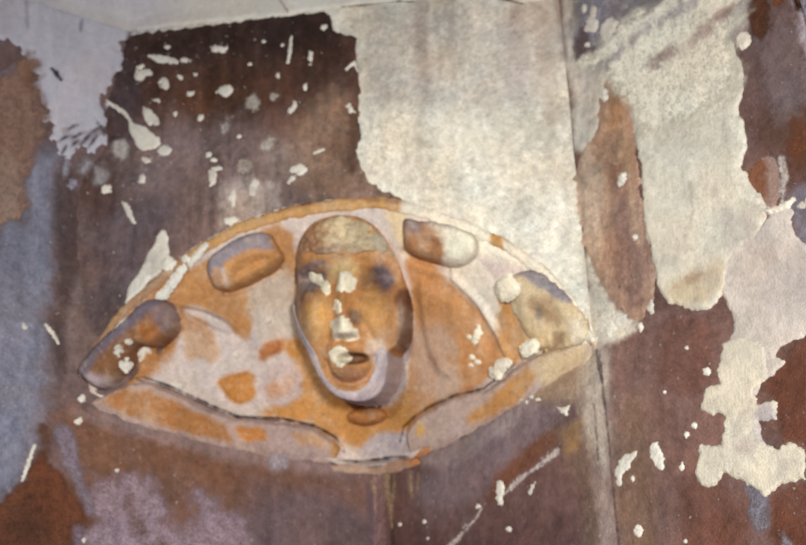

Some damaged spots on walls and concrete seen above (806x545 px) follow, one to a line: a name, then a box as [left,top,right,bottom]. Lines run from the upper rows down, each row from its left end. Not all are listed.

rust [747,0,782,39]
peeling [0,0,402,336]
flaking render [572,0,806,497]
peeling [495,273,521,302]
peeling [113,339,152,373]
peeling [466,324,513,381]
peeling [519,338,540,358]
peeling [21,444,37,482]
water stain [269,453,288,470]
rust [0,423,88,545]
water stain [54,425,253,545]